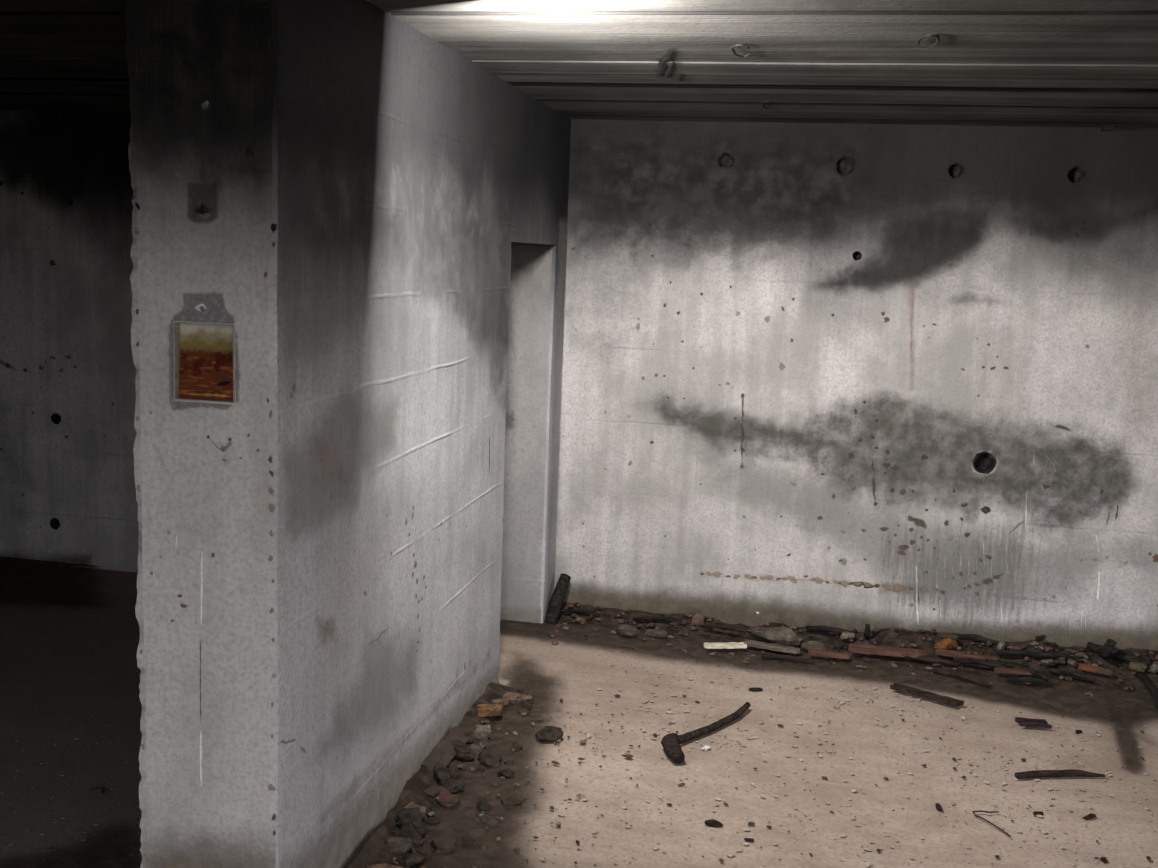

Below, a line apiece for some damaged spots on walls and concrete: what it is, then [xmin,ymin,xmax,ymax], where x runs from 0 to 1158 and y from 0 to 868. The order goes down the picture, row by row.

crack [0,355,77,372]
damp [660,393,1128,530]
corrosion [700,572,929,592]